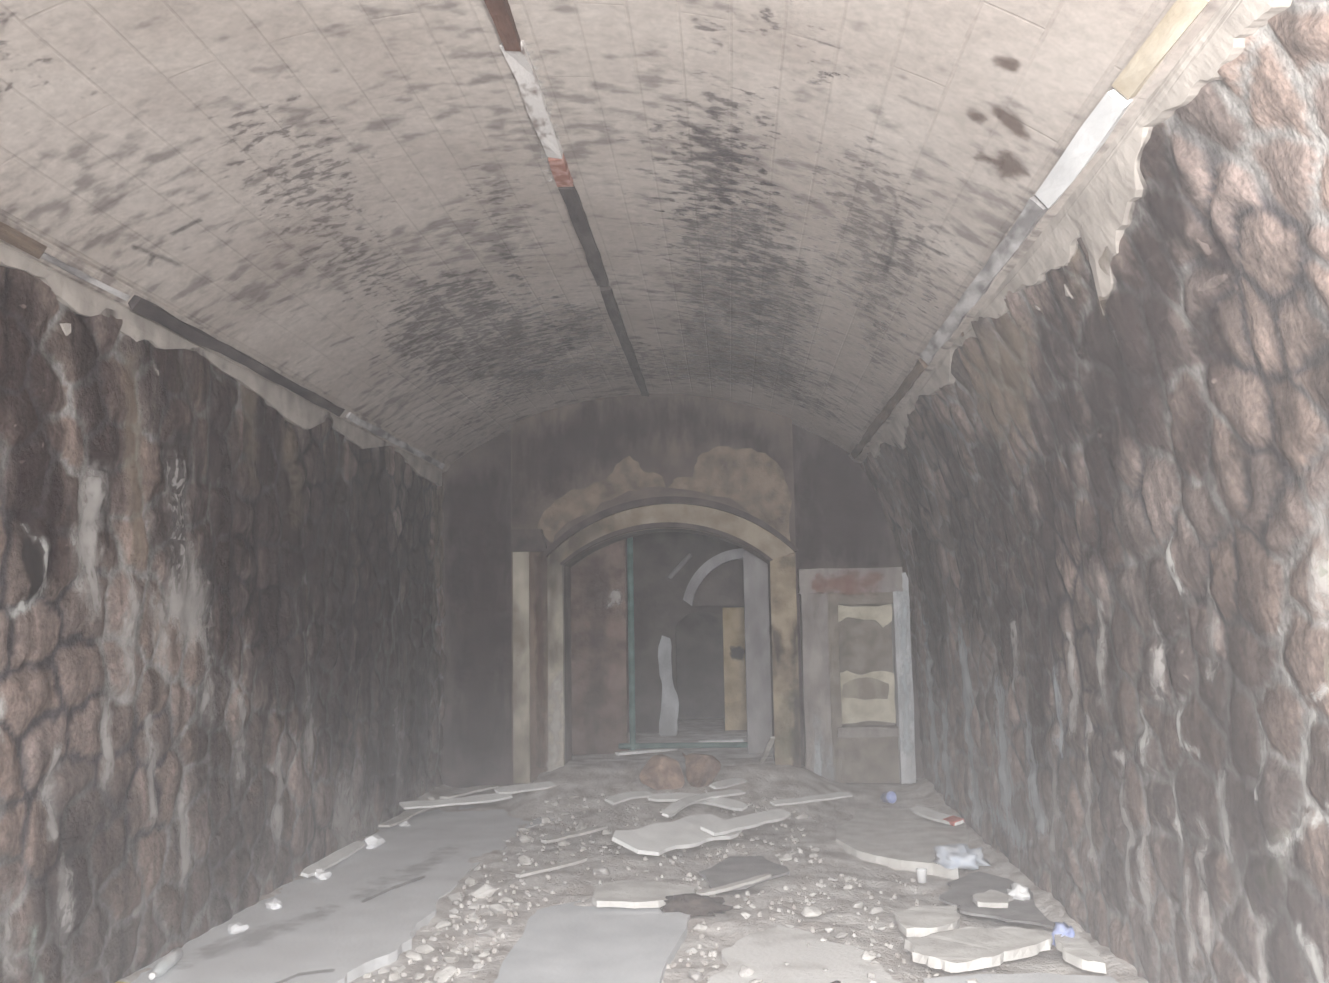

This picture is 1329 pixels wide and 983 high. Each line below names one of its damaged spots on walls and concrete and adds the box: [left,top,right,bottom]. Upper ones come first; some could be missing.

spalling [22,538,44,600]
leakage [0,277,119,610]
peeling [0,242,442,486]
leakage [370,245,612,389]
peeling [537,446,792,543]
leakage [639,90,827,387]
peeling [869,0,1292,458]